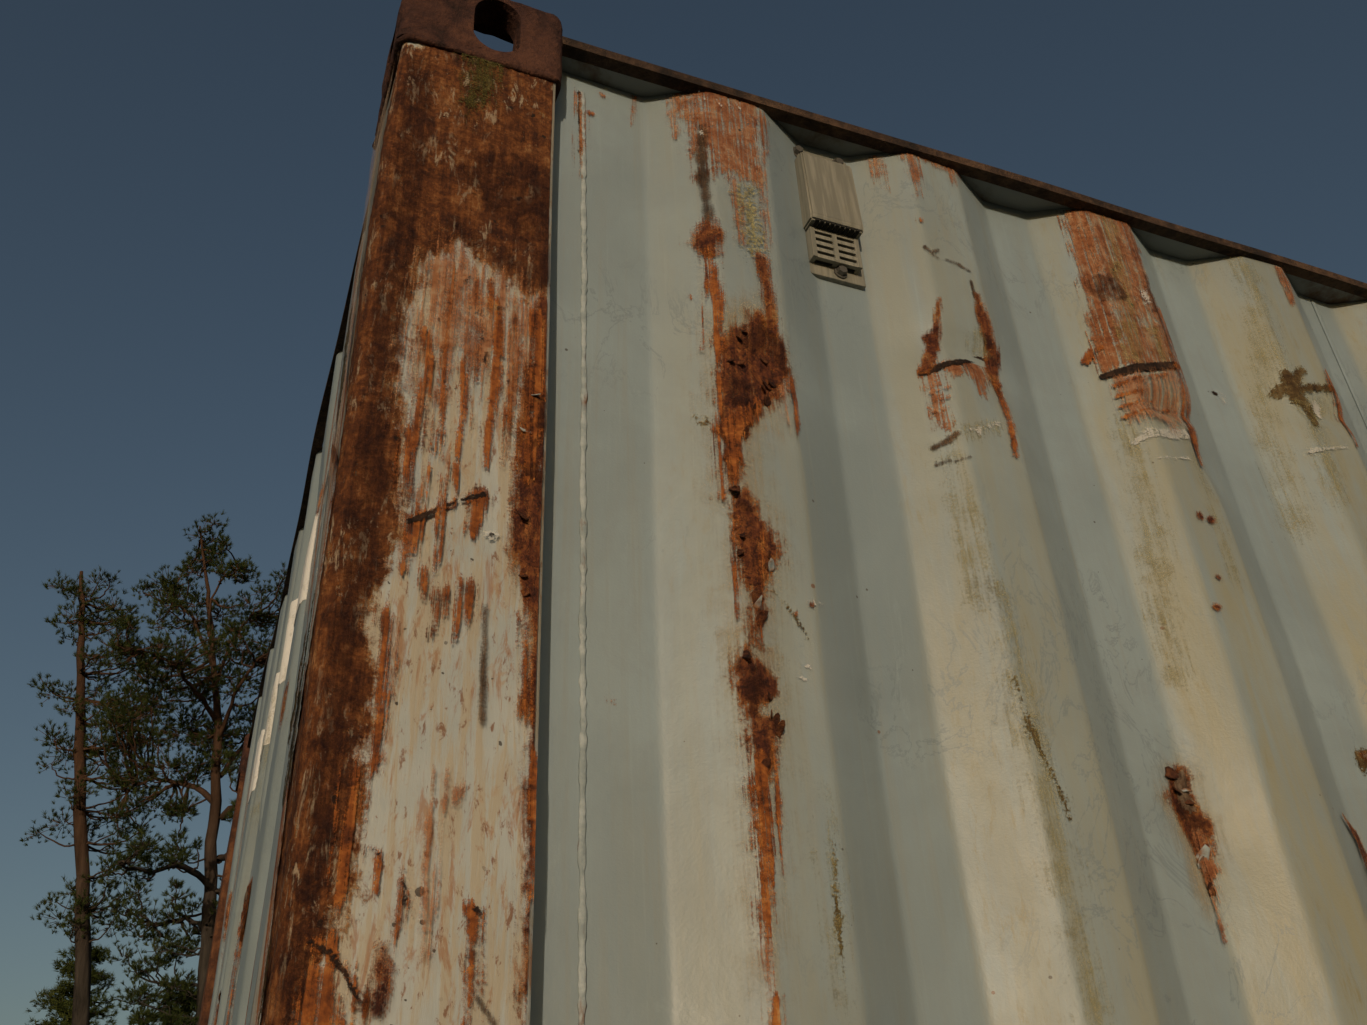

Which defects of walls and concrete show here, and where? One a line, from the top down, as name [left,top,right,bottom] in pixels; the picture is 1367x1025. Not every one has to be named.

rust [917,293,1019,458]
rust [1057,209,1203,466]
rust [214,43,553,1025]
rust [666,91,801,1025]
rust [1164,765,1228,943]